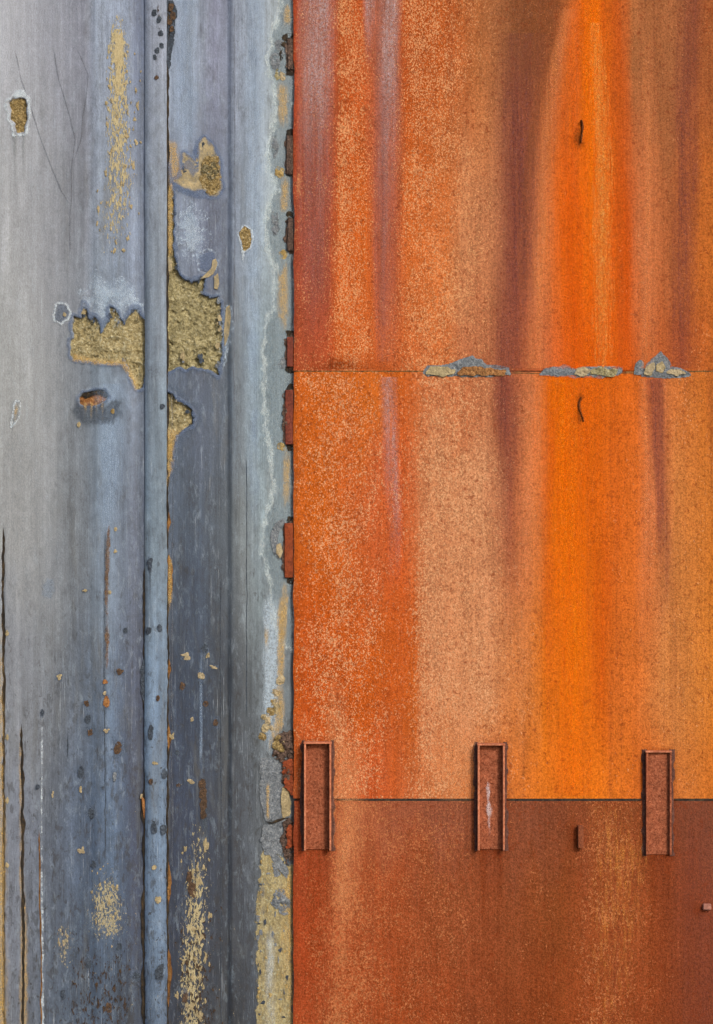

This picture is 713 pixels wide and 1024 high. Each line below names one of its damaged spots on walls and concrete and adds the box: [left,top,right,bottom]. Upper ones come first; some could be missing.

spalling [4,90,30,137]
peeling [96,9,145,264]
spalling [168,137,223,375]
spalling [63,308,145,390]
peeling [423,355,511,377]
peeling [539,351,691,379]
spalling [160,393,192,477]
peeling [175,824,212,1024]
peeling [255,757,294,1024]